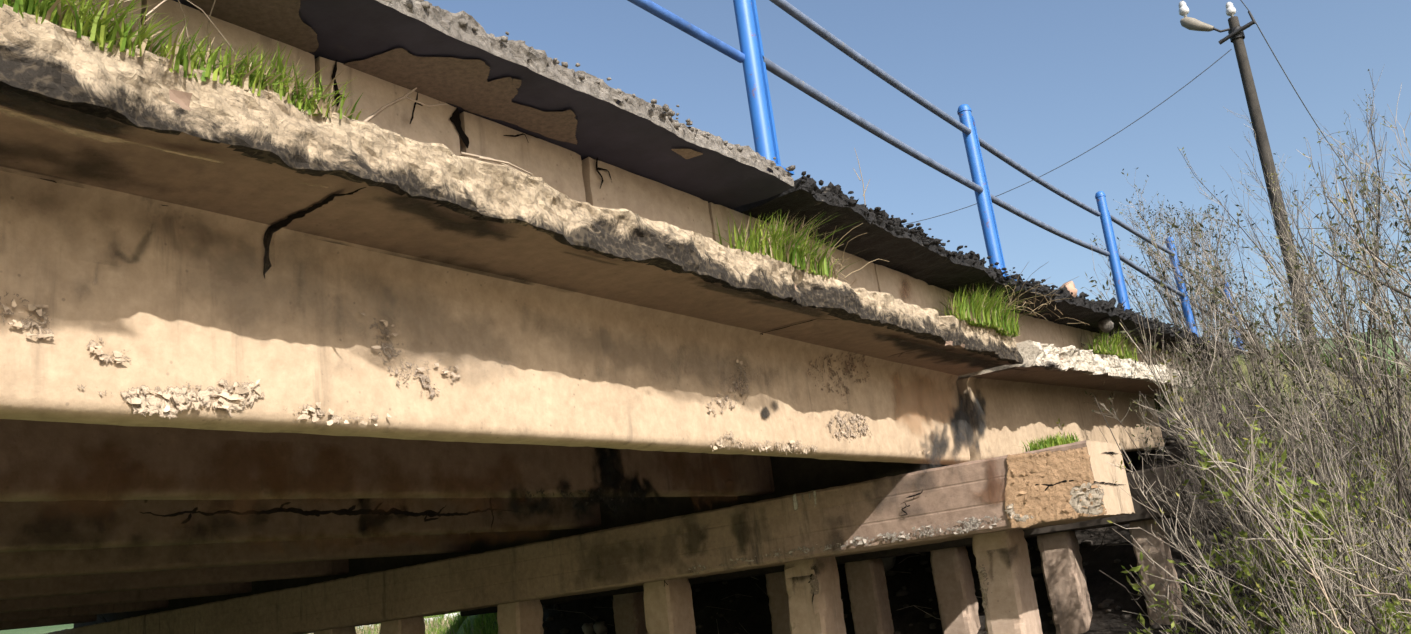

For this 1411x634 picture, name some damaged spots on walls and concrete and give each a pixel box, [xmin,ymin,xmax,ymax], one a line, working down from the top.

peeling [188,0,319,52]
peeling [343,48,578,145]
crack [263,187,366,278]
spalling [0,292,54,339]
spalling [87,338,131,364]
spalling [360,312,461,398]
spalling [78,378,265,419]
spalling [285,402,391,427]
water stain [926,390,986,465]
crack [140,498,522,528]
water stain [494,447,667,520]
spalling [688,447,1107,595]